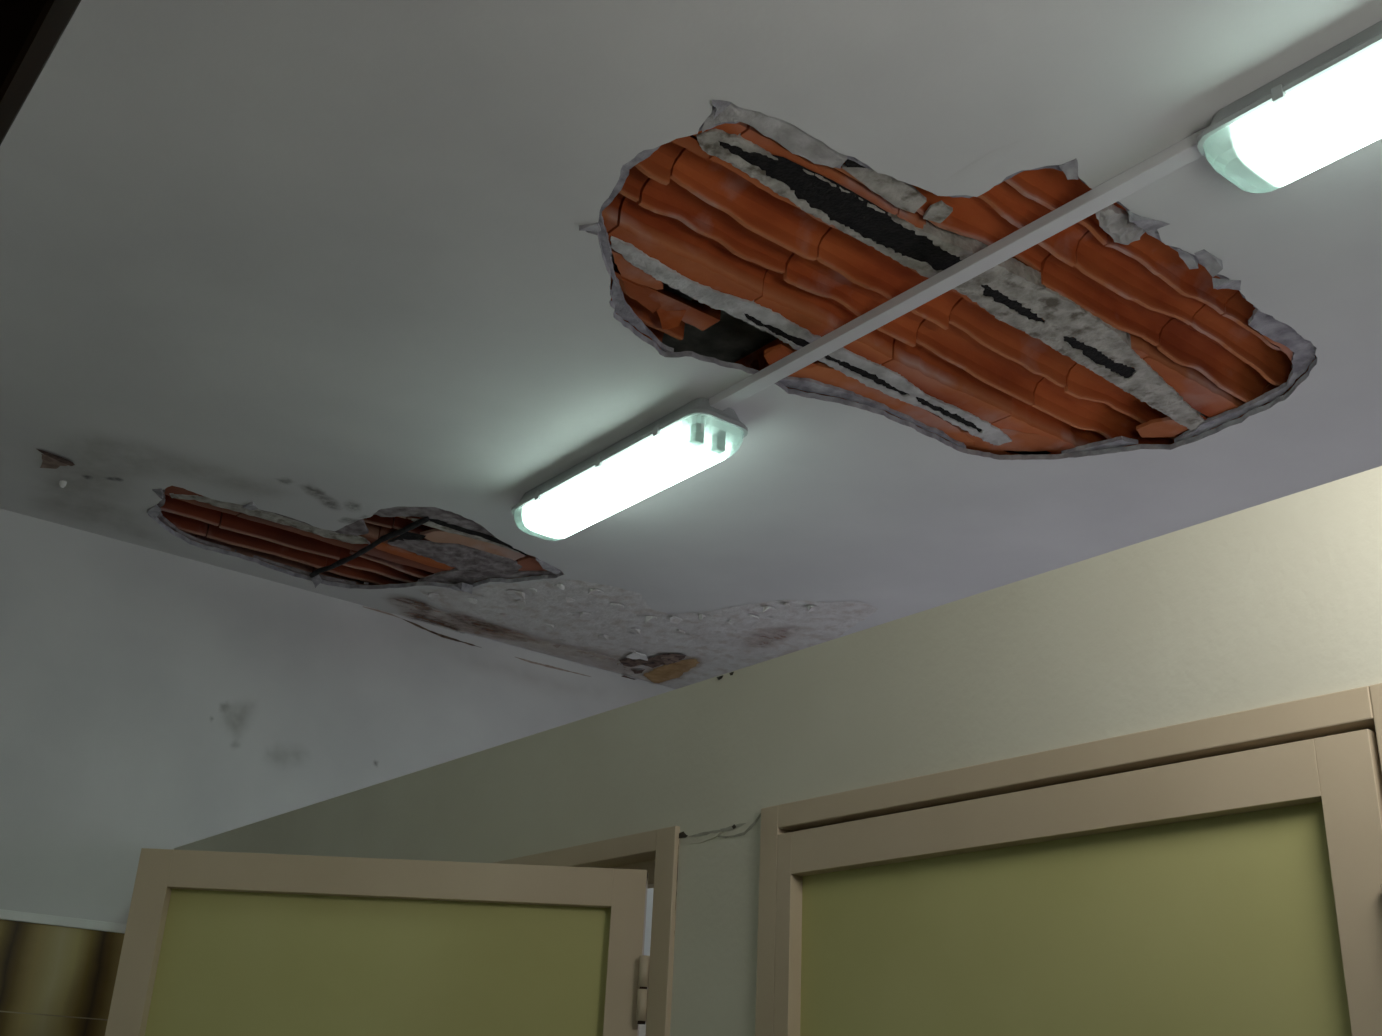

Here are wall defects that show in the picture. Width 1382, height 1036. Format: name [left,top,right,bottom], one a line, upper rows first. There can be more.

spalling [579,99,1092,371]
spalling [779,201,1316,455]
peeling [147,486,878,689]